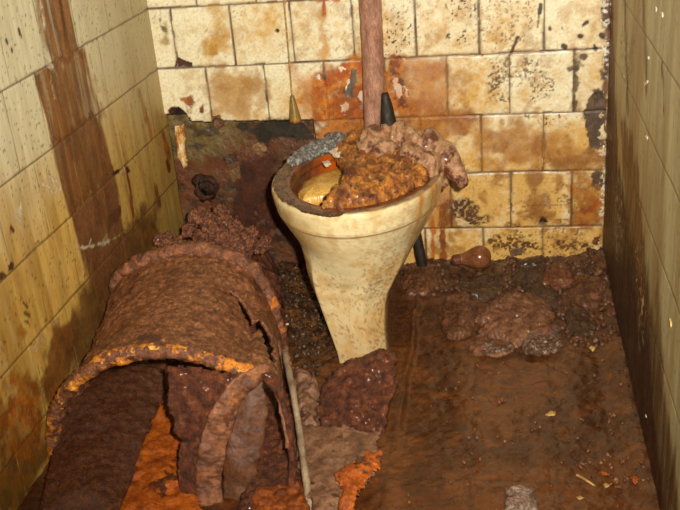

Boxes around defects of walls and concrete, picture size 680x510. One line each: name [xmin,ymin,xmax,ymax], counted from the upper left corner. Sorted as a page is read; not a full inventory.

rust [34,0,127,301]
spalling [167,107,316,265]
rust [304,55,364,139]
peeling [338,66,363,115]
rust [384,55,475,138]
damp [440,199,489,228]
damp [477,0,677,510]
spalling [583,0,611,225]
rust [0,323,78,510]